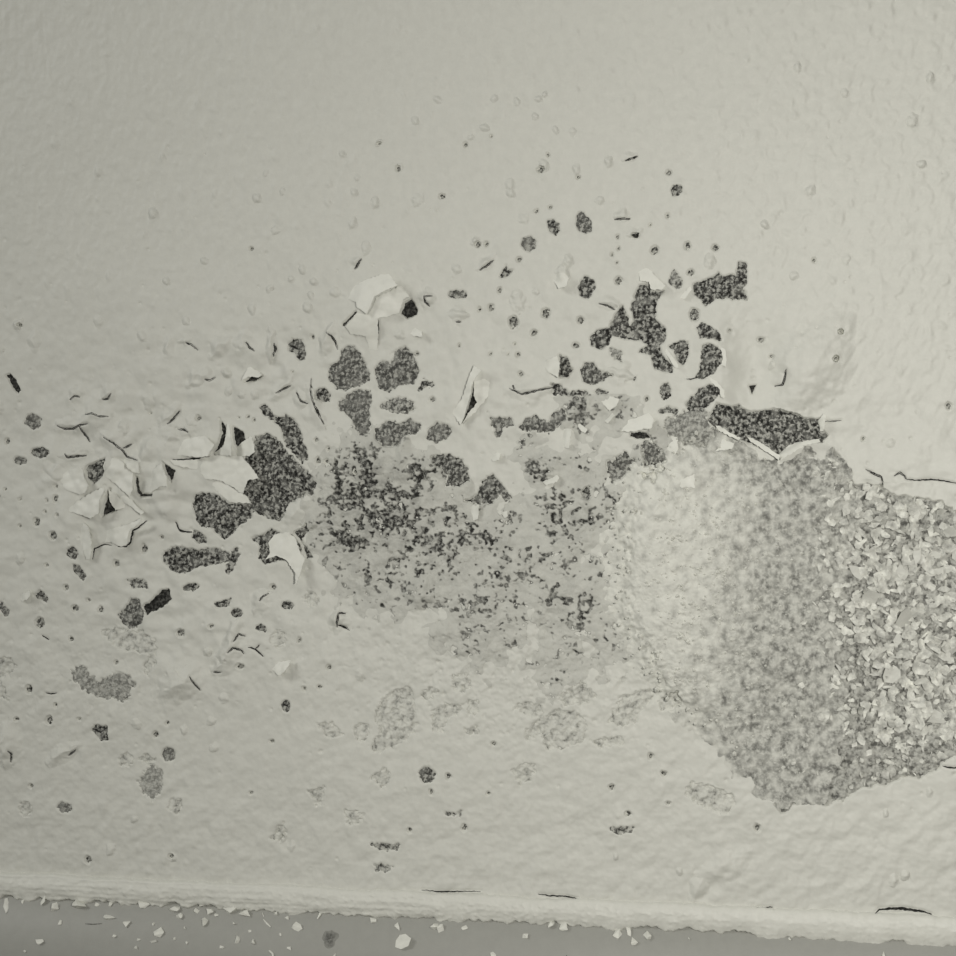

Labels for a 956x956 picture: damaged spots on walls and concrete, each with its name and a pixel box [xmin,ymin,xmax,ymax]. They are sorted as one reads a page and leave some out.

spalling [498,236,537,293]
spalling [7,374,21,393]
spalling [24,413,42,430]
spalling [14,447,49,465]
crack [906,477,956,485]
spalling [35,262,956,806]
spalling [21,590,48,603]
spalling [686,781,735,813]